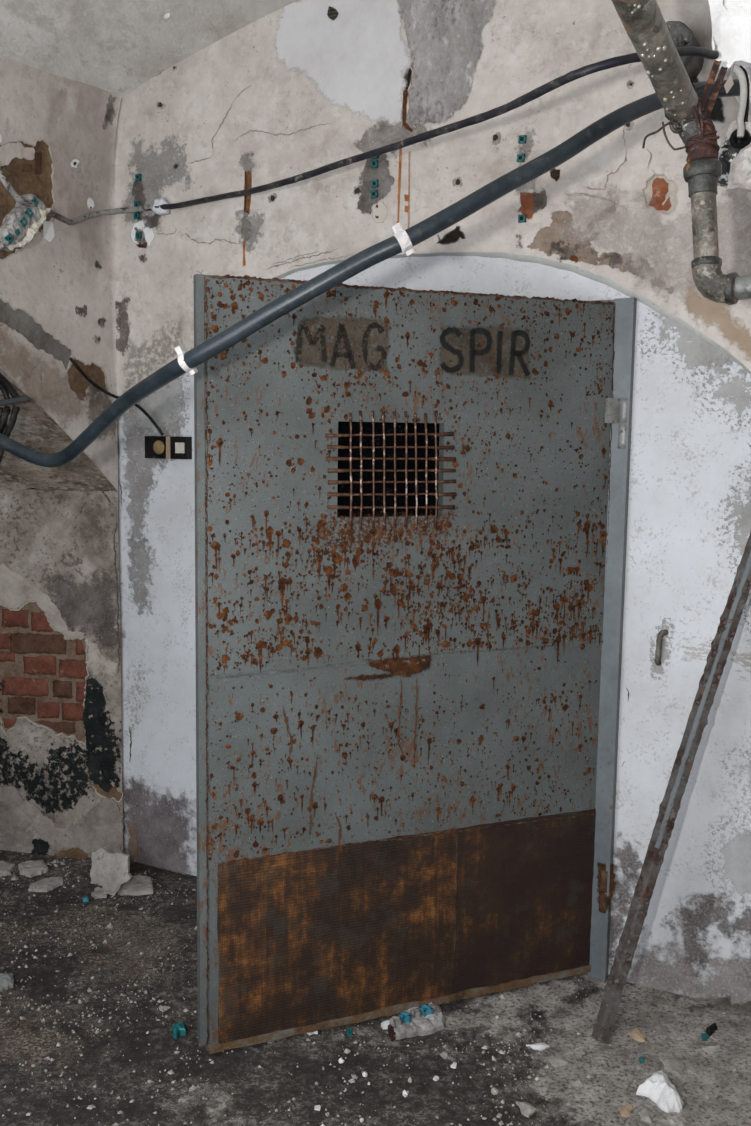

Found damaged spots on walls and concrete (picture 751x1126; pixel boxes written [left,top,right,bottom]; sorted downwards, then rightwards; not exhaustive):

crack [190,85,334,164]
rust [402,88,413,132]
flaking render [397,0,497,130]
flaking render [0,139,56,260]
flaking render [0,297,108,404]
crack [158,225,239,245]
rust [204,241,307,341]
leakage [563,191,751,357]
rust [205,283,615,1045]
flaking render [0,564,150,892]
leakage [608,834,643,977]
leakage [626,894,751,1012]